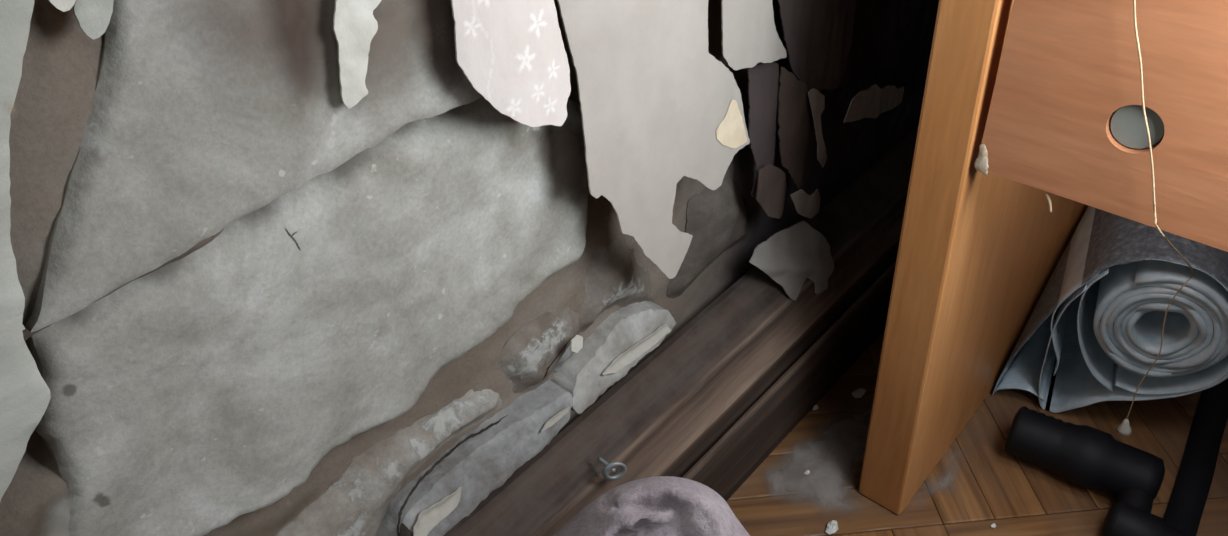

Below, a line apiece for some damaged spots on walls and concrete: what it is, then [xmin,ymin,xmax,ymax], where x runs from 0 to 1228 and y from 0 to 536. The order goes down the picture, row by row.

peeling [49,0,114,39]
peeling [333,0,382,109]
crack [397,415,508,536]